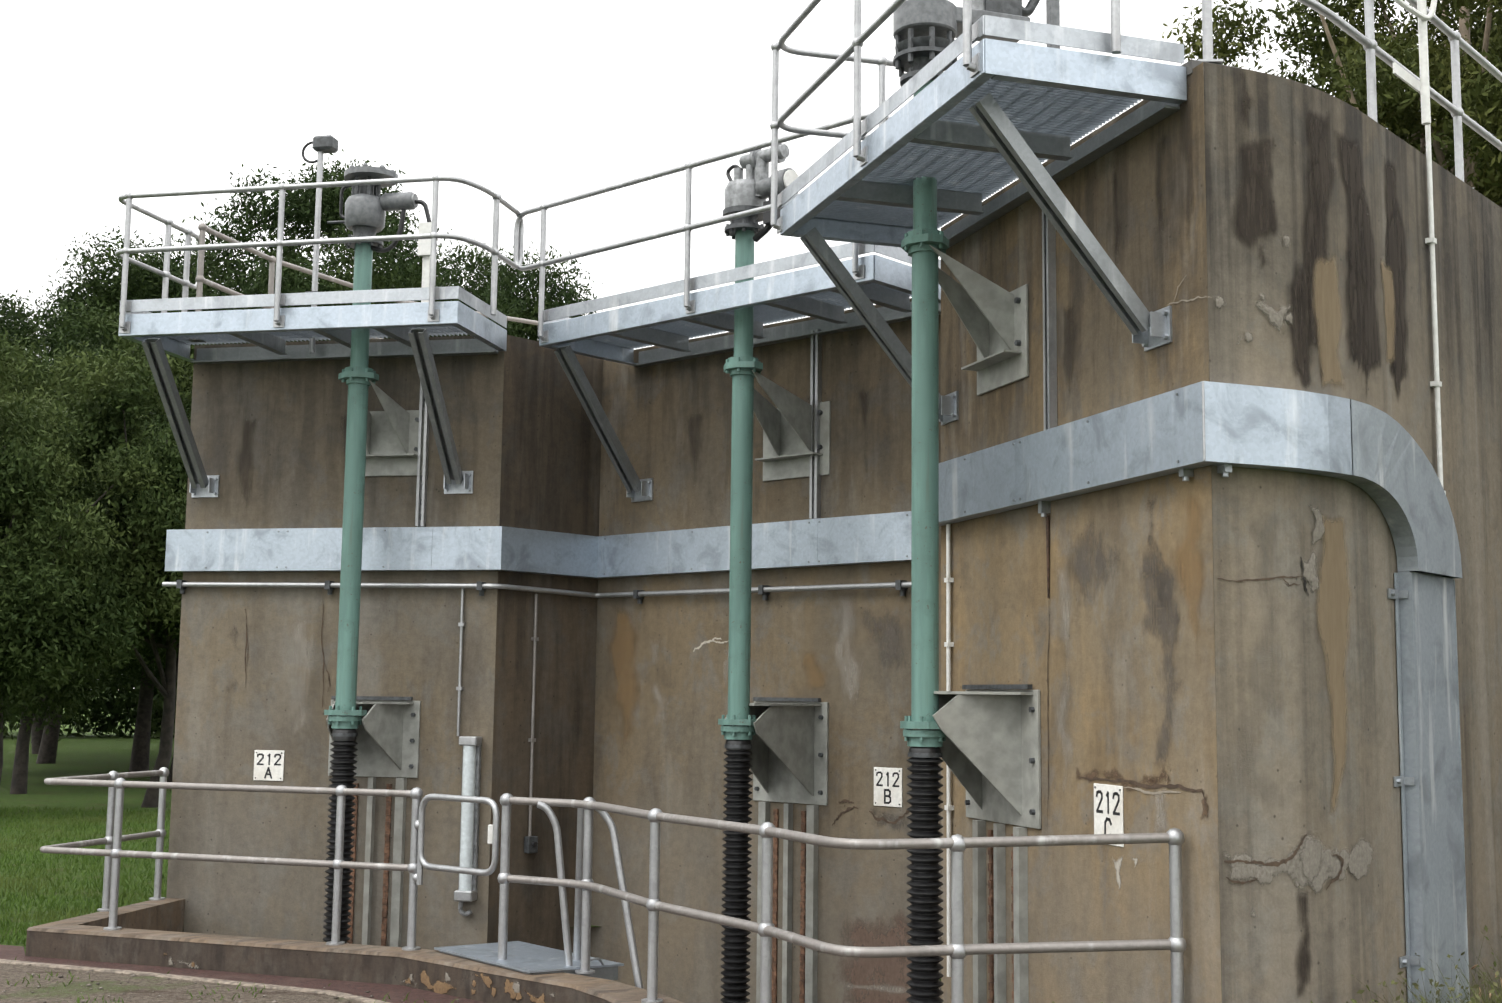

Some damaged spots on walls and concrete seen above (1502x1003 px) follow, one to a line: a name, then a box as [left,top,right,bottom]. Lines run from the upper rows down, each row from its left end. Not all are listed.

leakage [1236,140,1277,265]
leakage [1290,112,1407,396]
crack [1218,576,1303,586]
crack [693,637,728,670]
leakage [1143,526,1179,761]
crack [1076,768,1206,810]
peeling [402,970,554,1003]